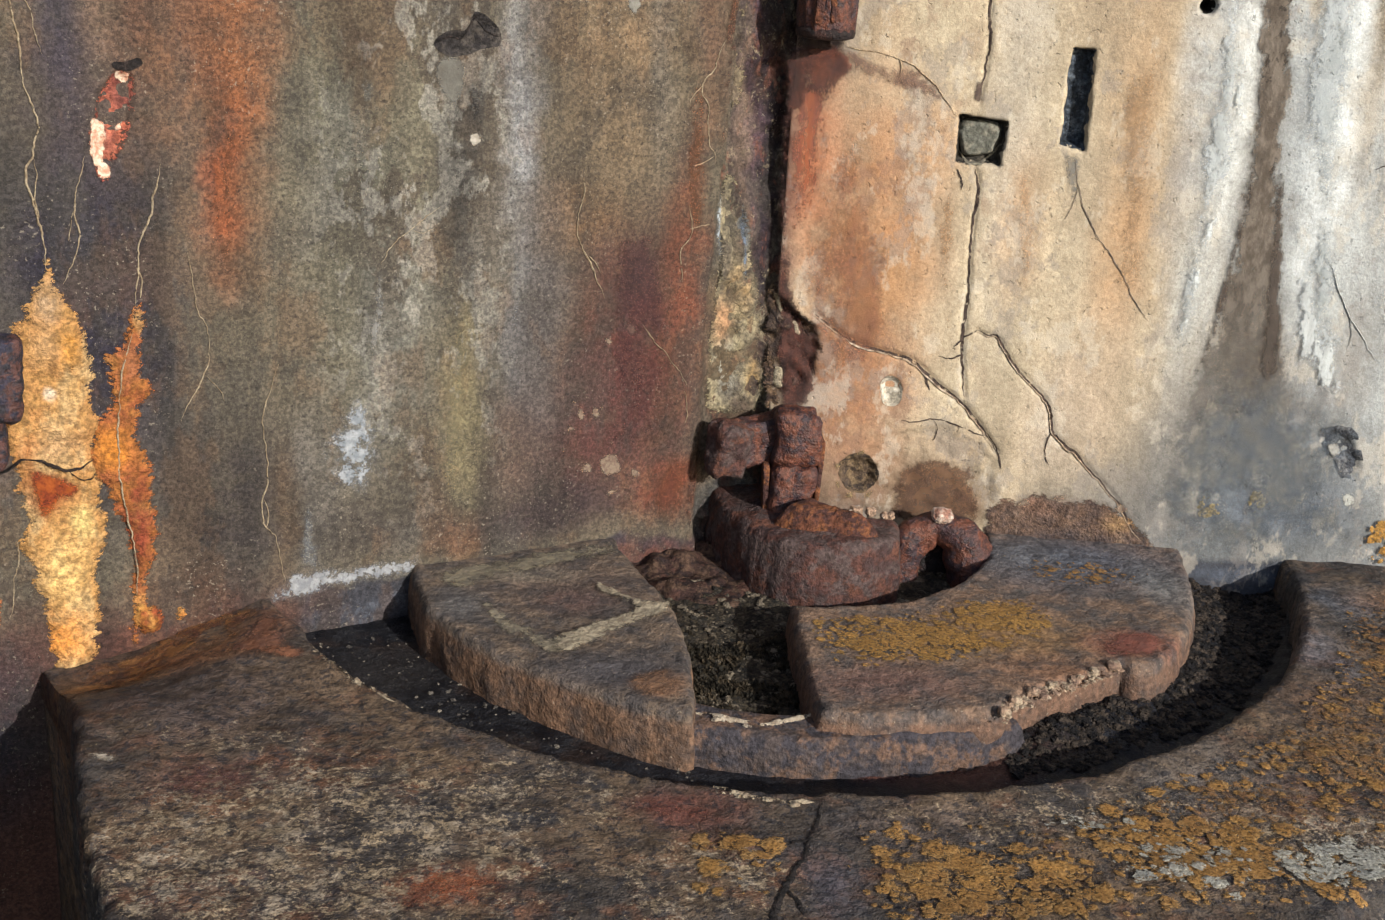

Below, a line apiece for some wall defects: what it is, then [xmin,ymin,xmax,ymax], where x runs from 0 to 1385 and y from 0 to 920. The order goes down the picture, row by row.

spalling [433,11,502,57]
rust [814,0,837,25]
crack [848,0,993,116]
spalling [88,58,143,182]
water stain [1166,0,1356,536]
crack [770,160,1148,541]
rust [760,461,770,508]
rust [813,438,826,501]
spalling [1319,425,1363,506]
crack [768,801,822,920]